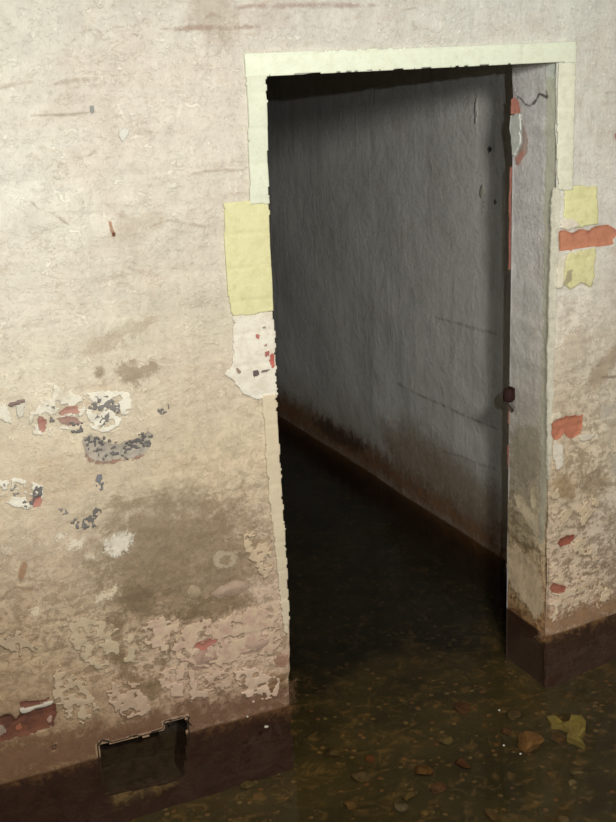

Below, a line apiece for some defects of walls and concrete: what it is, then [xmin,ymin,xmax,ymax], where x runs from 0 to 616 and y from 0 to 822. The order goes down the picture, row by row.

peeling [223,201,278,400]
peeling [506,79,616,622]
flaking render [0,384,153,464]
flaking render [0,477,44,510]
leakage [275,394,502,558]
peeling [52,507,136,568]
peeling [213,529,274,579]
peeling [91,584,122,607]
peeling [63,607,289,703]
peeling [0,664,151,743]
spalling [97,716,192,803]